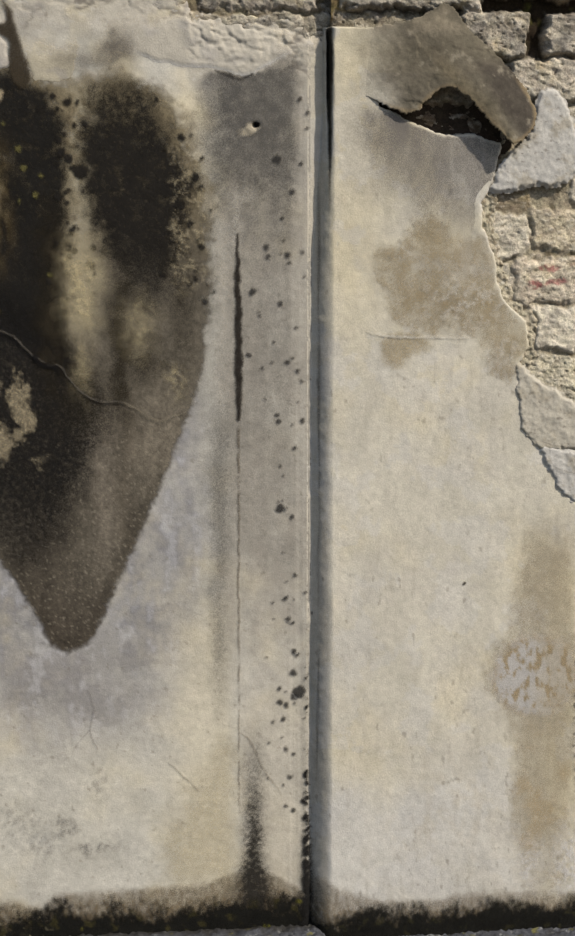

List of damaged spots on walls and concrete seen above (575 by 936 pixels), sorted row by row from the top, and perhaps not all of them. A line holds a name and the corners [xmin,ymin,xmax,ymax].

flaking render [0,37,9,68]
flaking render [27,43,77,82]
leakage [0,1,303,652]
flaking render [131,0,575,503]
leakage [362,112,526,381]
mould [273,667,309,723]
leakage [494,544,575,864]
leakage [0,766,575,936]